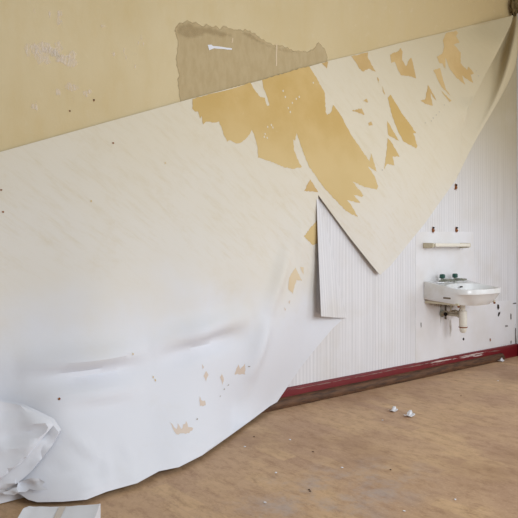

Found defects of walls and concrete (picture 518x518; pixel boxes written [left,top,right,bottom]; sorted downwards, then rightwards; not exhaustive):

damp [175,21,327,101]
peeling [297,352,484,389]